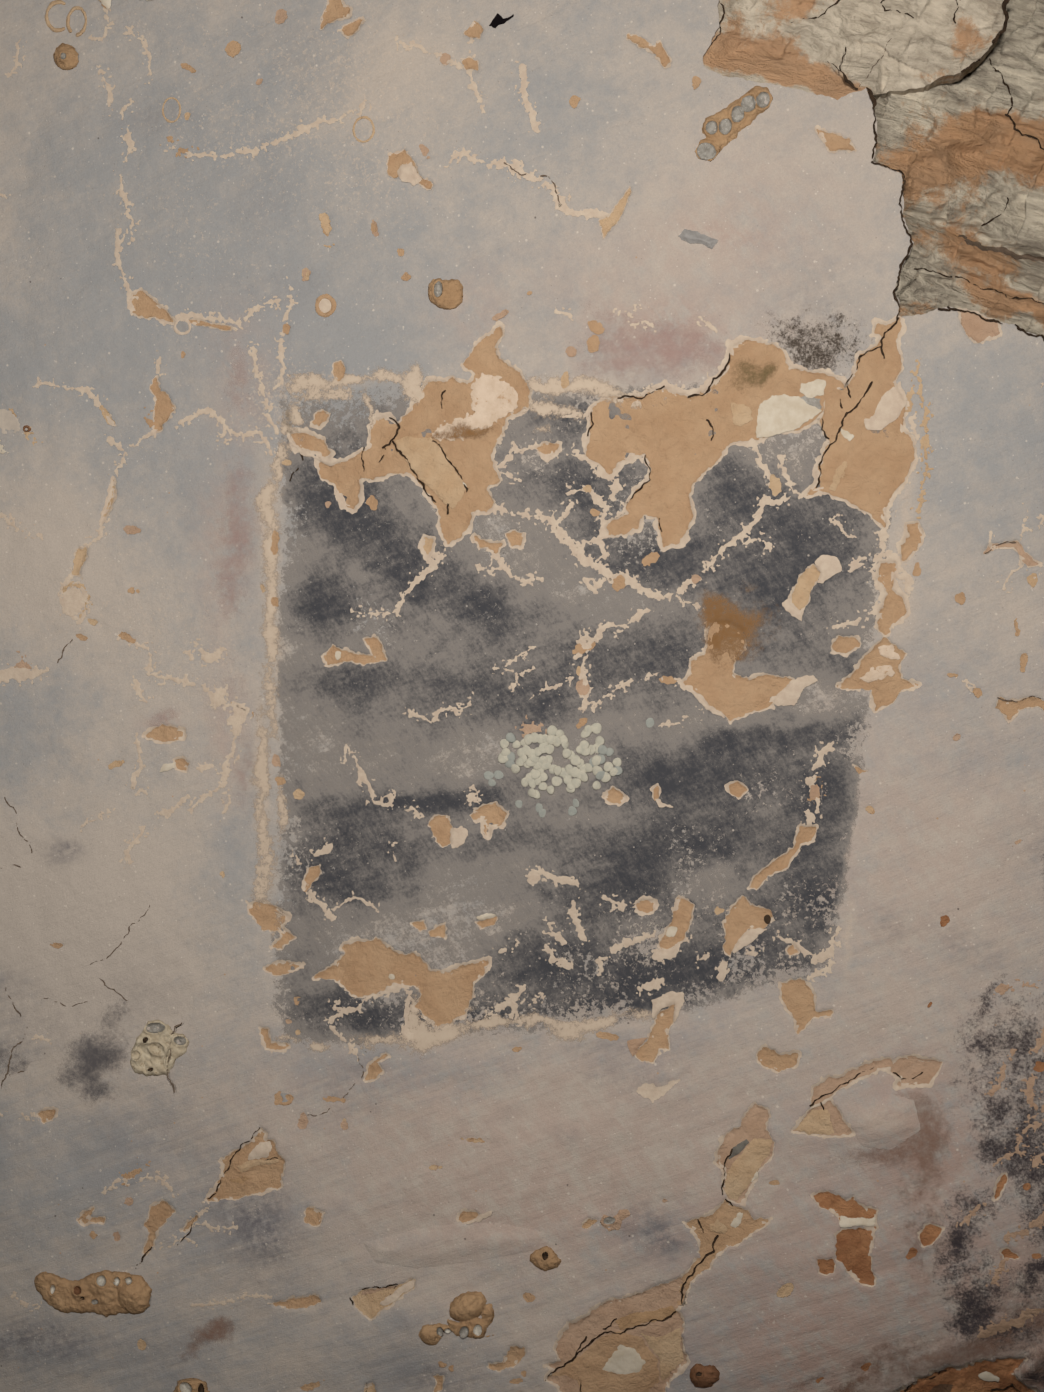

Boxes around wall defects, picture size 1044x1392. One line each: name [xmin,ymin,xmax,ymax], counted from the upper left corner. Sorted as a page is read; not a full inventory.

crack [711,1,725,45]
crack [791,0,840,23]
crack [816,0,1044,488]
water stain [742,363,775,384]
water stain [773,315,857,370]
flaking render [32,61,934,1083]
flaking render [76,1127,286,1256]
flaking render [487,1100,780,1392]
flaking render [810,1190,879,1288]
flaking render [791,1053,943,1139]
peeling [906,1027,1044,1260]
flaking render [895,1357,1039,1392]